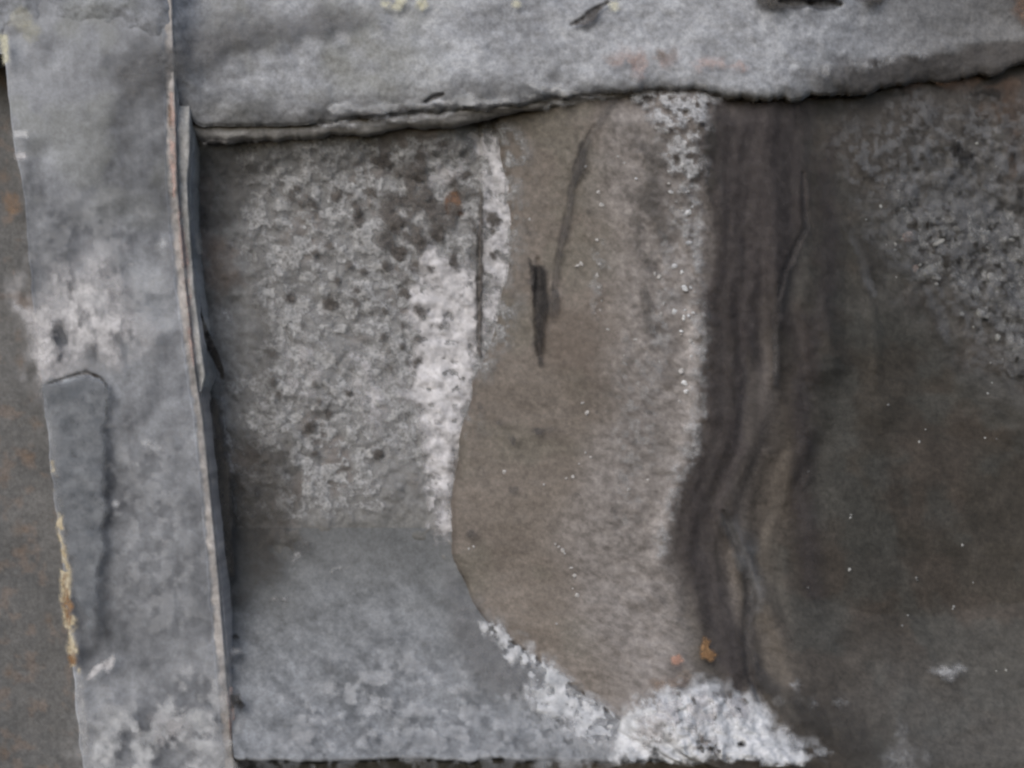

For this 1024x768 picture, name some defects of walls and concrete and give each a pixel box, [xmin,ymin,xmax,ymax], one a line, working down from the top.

water stain [632,84,810,680]
rust [56,514,88,753]
water stain [454,602,615,744]
efflorescence [936,666,960,679]